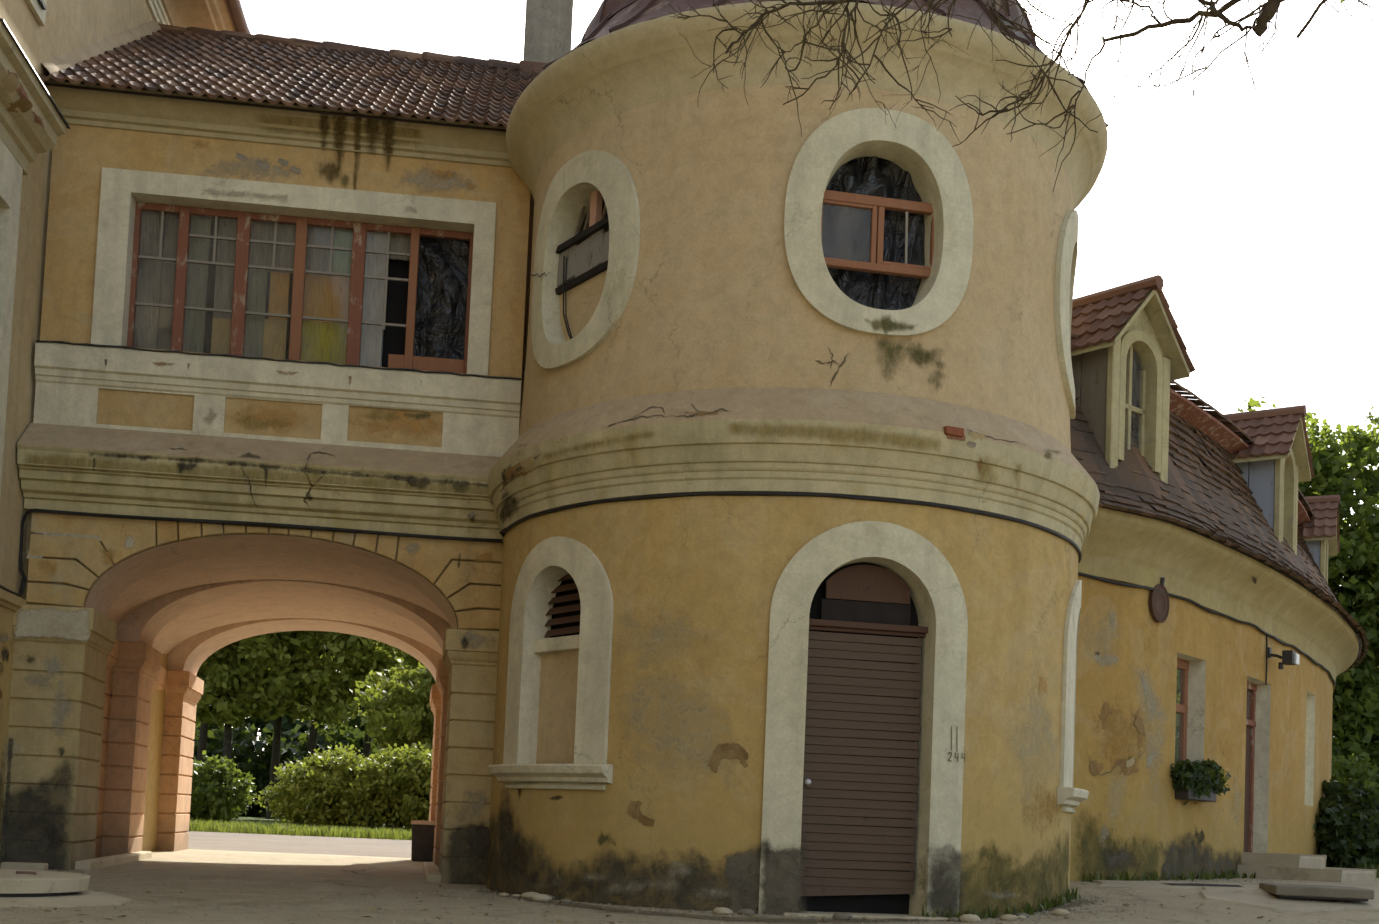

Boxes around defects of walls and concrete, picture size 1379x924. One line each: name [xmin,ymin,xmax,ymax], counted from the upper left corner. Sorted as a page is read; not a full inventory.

water stain [266,114,419,190]
water stain [872,317,941,385]
crack [608,404,729,427]
crack [303,451,334,506]
flaking render [709,743,748,773]
peeling [1089,703,1146,776]
water stain [0,739,72,870]
water stain [449,789,805,915]
water stain [920,820,1241,918]